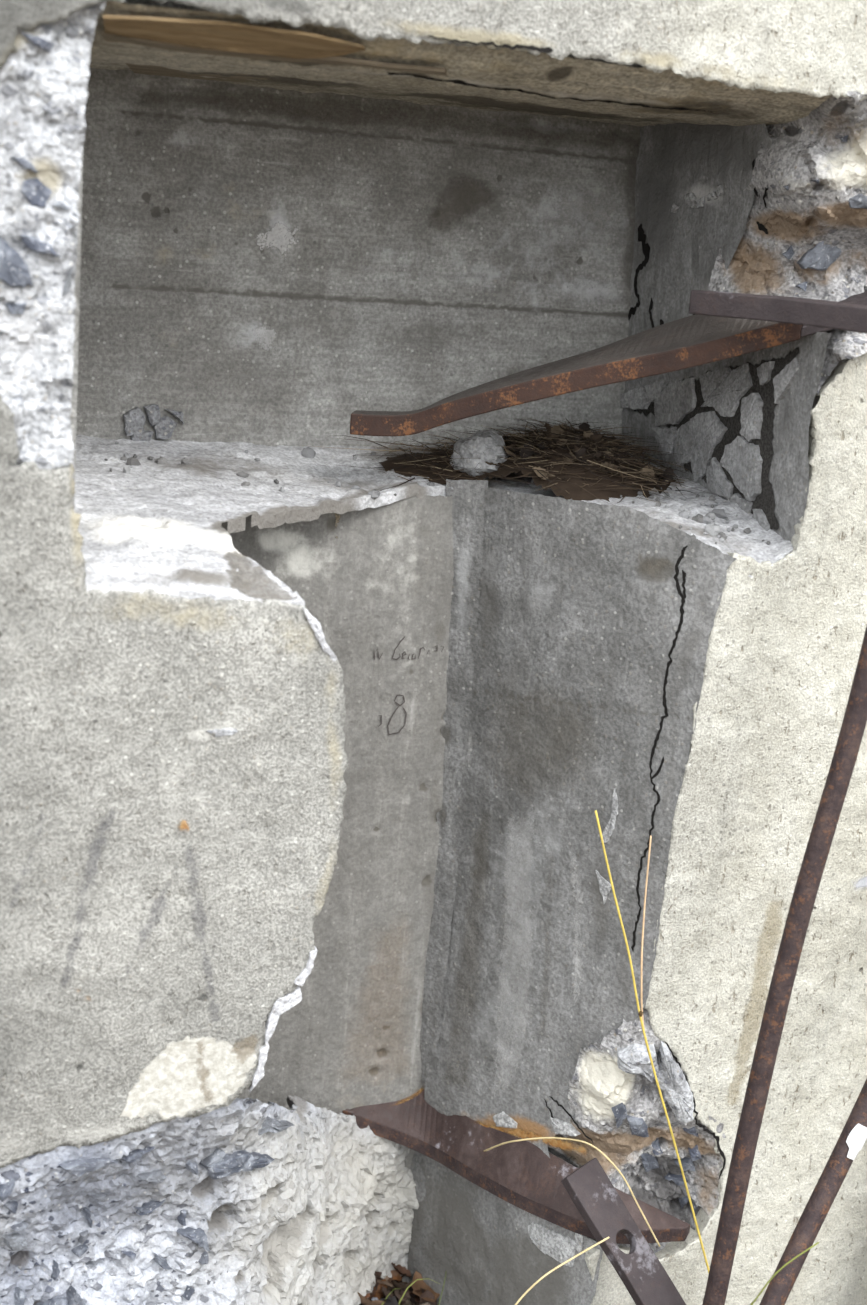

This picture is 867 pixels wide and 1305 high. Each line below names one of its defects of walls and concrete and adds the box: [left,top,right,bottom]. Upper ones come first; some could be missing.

spalling [0,0,107,469]
spalling [123,404,184,441]
crack [628,224,695,328]
crack [620,347,799,531]
spalling [708,91,867,302]
spalling [817,329,867,394]
crack [631,546,688,951]
spalling [0,946,419,1305]
peeling [493,1112,518,1129]
rust [479,1122,586,1153]
spalling [547,1009,726,1230]
peeling [528,1222,589,1267]